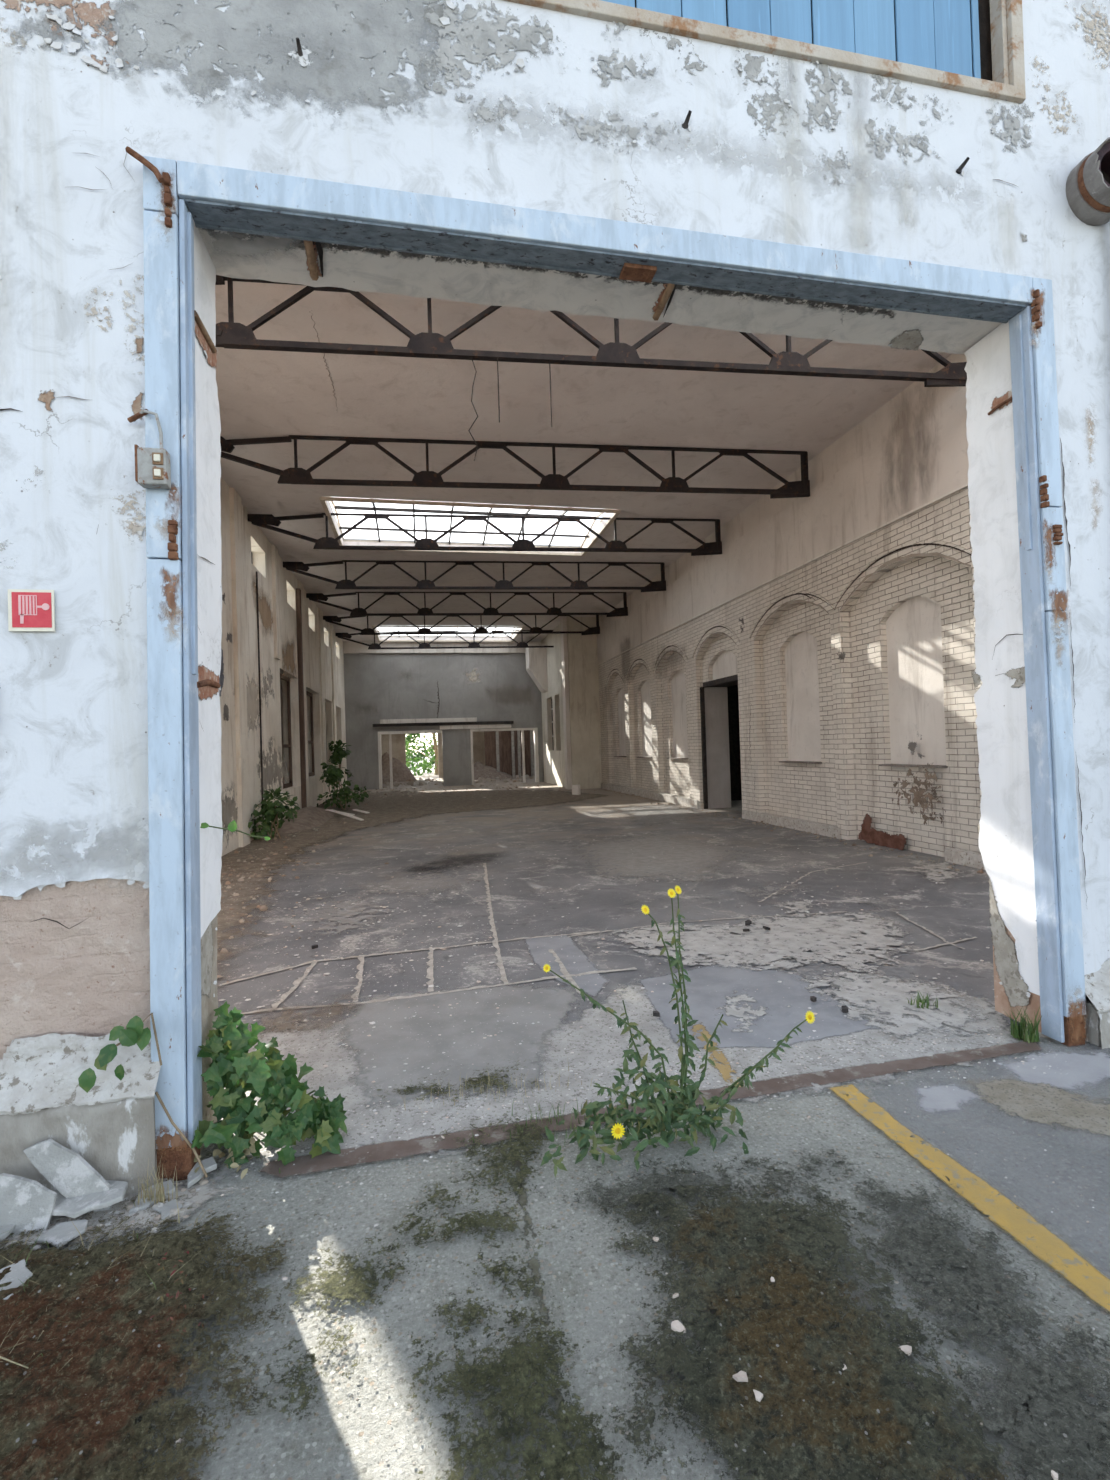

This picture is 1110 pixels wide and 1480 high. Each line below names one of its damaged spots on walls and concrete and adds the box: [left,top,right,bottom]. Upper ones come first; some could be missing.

peeling [0,0,563,131]
peeling [576,21,656,87]
peeling [731,51,853,140]
peeling [864,74,952,164]
peeling [986,55,1080,153]
corrosion [1043,520,1055,567]
damp [253,581,273,632]
corrosion [1050,589,1068,622]
damp [221,791,238,840]
crack [31,917,89,929]
spalling [0,878,151,1060]
corrosion [1069,1001,1086,1043]